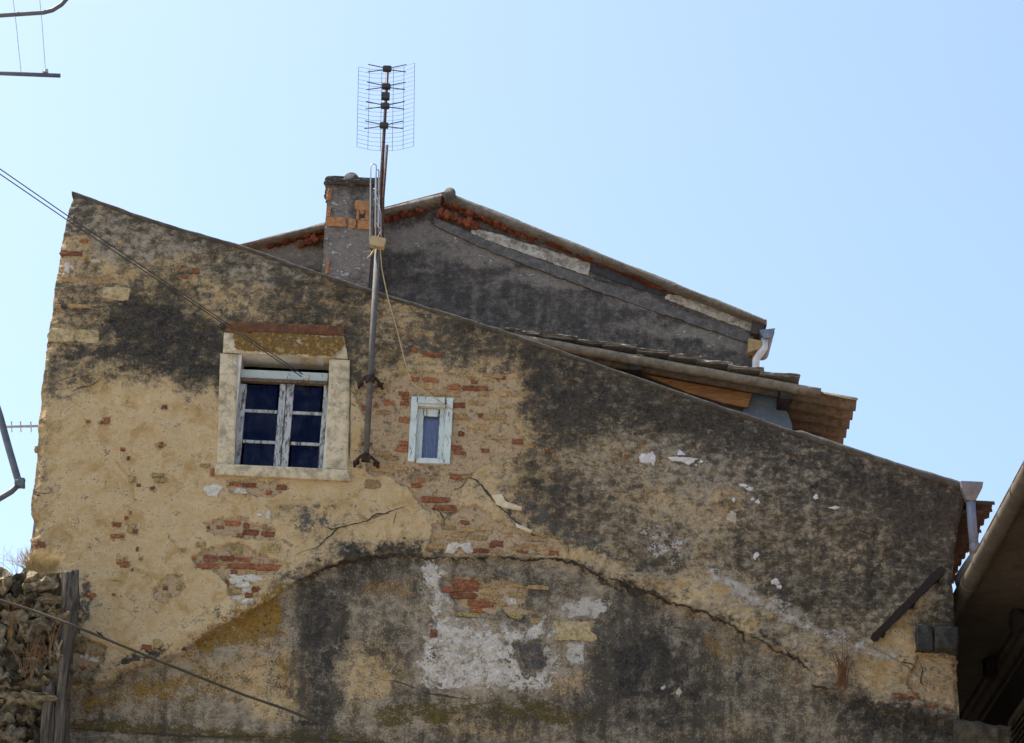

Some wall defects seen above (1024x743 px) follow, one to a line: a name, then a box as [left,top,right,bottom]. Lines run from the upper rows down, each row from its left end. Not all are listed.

leakage [51,296,222,387]
peeling [622,440,703,466]
leakage [116,644,188,666]
flaking render [178,510,282,605]
leakage [291,579,352,726]
flaking render [351,370,612,691]
leakage [515,641,545,670]
crack [296,473,832,689]
leakage [570,560,660,597]
leakage [602,617,705,734]
leakage [633,525,693,565]
leakage [702,562,899,671]